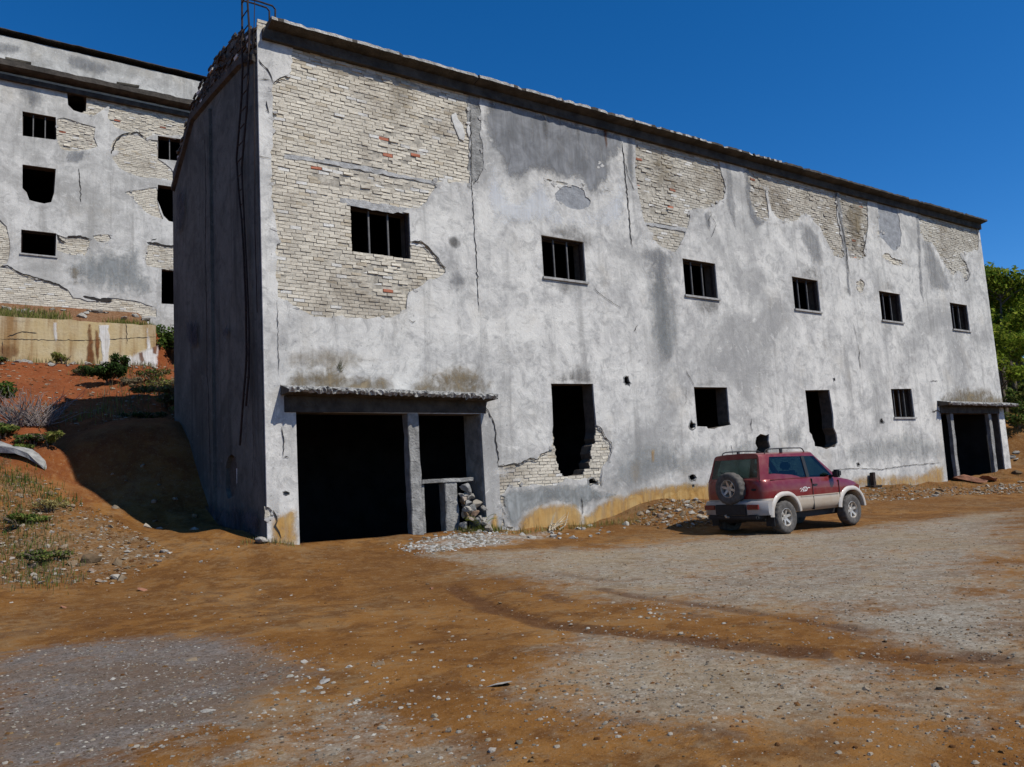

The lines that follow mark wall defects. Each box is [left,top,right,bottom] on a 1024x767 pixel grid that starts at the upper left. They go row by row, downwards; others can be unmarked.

flaking render [0,221,161,319]
flaking render [55,98,186,219]
flaking render [268,49,487,320]
crack [470,105,483,304]
damp [487,102,632,191]
crack [622,143,634,246]
flaking render [635,140,727,253]
flaking render [747,169,909,266]
flaking render [918,214,980,280]
damp [99,325,158,366]
flaking render [494,418,614,530]
damp [492,484,709,530]